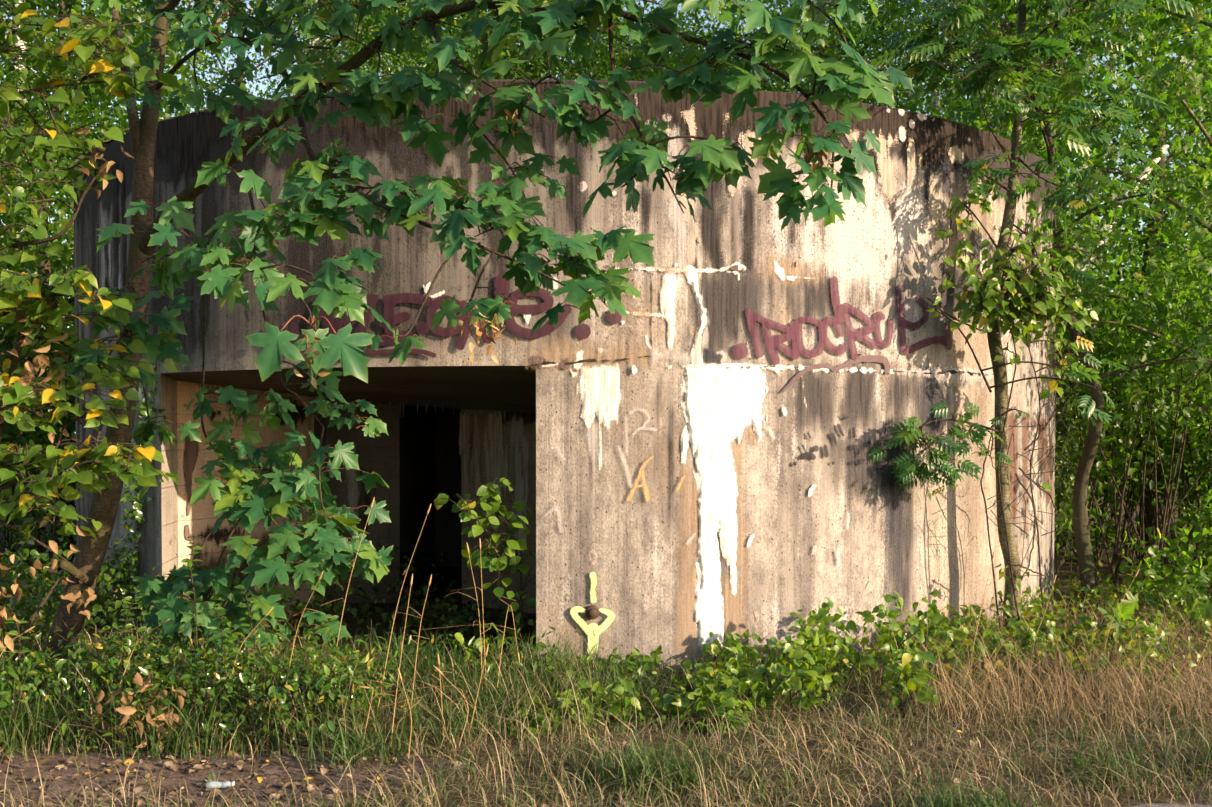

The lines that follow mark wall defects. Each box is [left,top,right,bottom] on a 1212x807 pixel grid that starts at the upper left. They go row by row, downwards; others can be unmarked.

leakage [941,221,984,310]
leakage [660,176,773,650]
leakage [783,364,950,615]